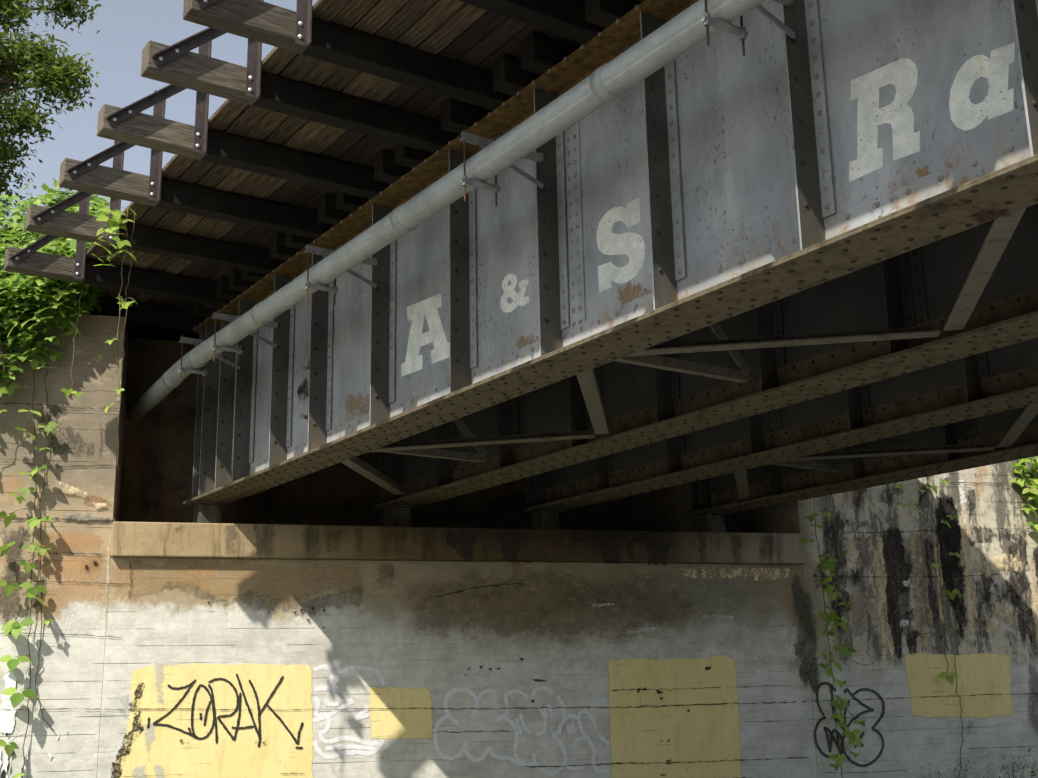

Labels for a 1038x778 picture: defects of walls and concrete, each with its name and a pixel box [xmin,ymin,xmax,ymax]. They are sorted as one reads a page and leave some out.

rust [618,282,651,305]
water stain [0,527,42,623]
water stain [59,547,110,634]
water stain [792,473,1038,694]
water stain [132,766,165,778]